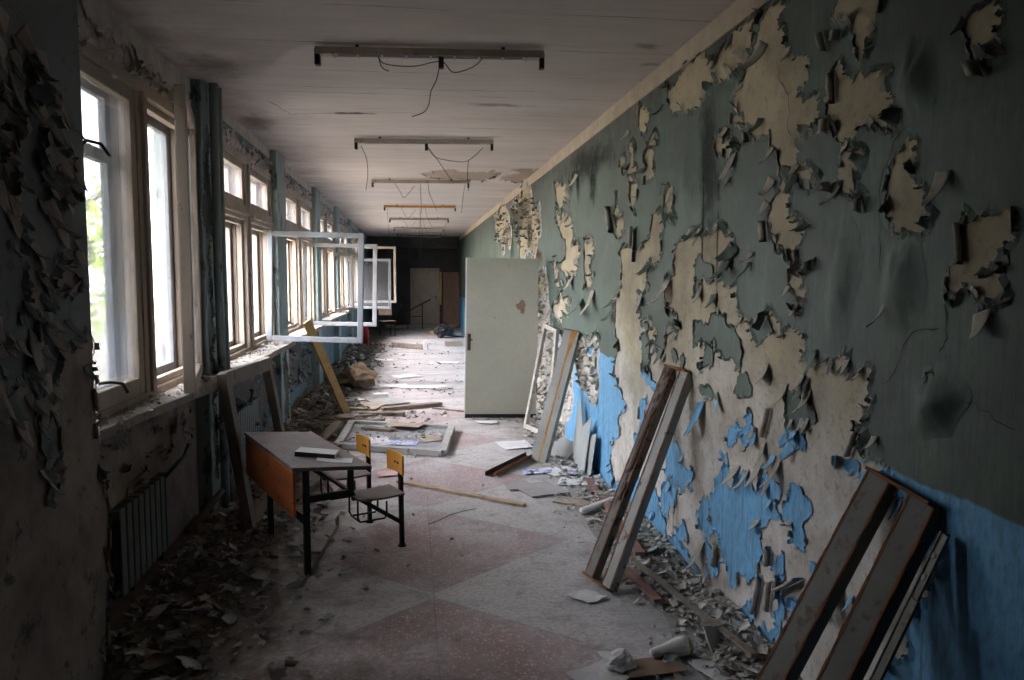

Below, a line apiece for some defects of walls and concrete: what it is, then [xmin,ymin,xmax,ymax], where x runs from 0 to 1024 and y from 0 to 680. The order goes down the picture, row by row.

peeling [0,0,202,680]
peeling [418,0,951,680]
peeling [949,0,1008,78]
peeling [942,199,1021,340]